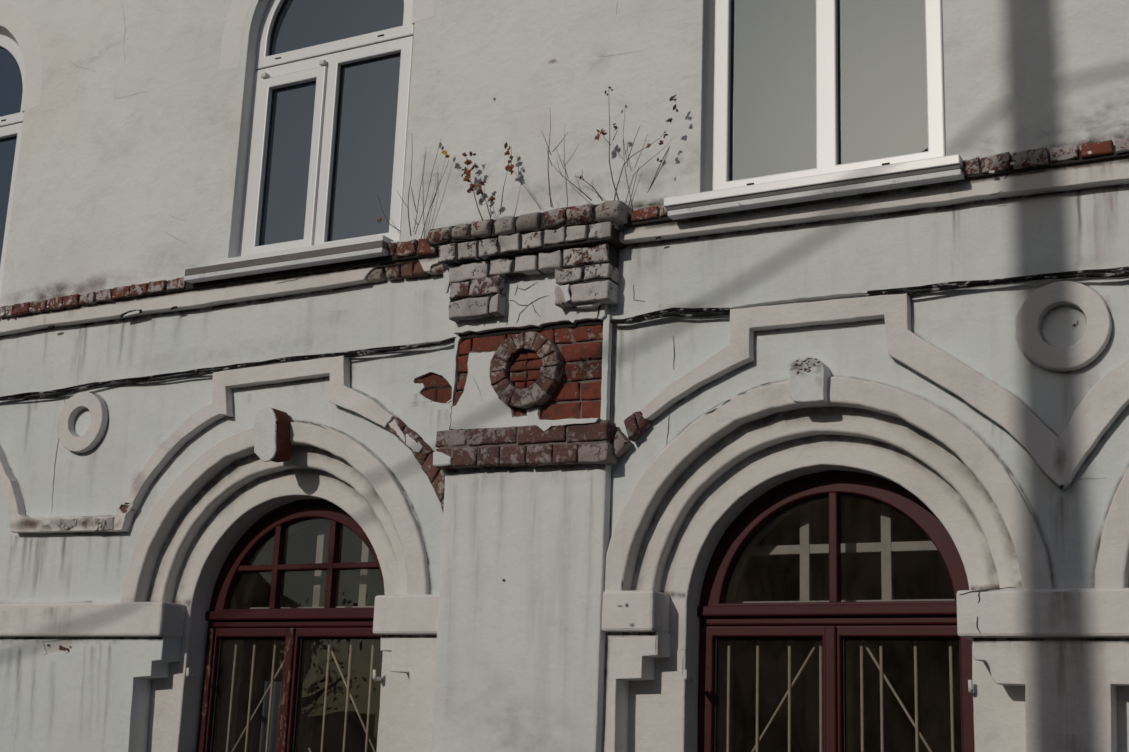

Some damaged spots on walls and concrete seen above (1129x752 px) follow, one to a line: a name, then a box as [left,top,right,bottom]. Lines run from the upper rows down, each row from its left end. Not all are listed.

crack [510,282,549,324]
flaking render [415,334,515,430]
flaking render [509,324,603,420]
flaking render [387,417,445,511]
flaking render [612,411,652,458]